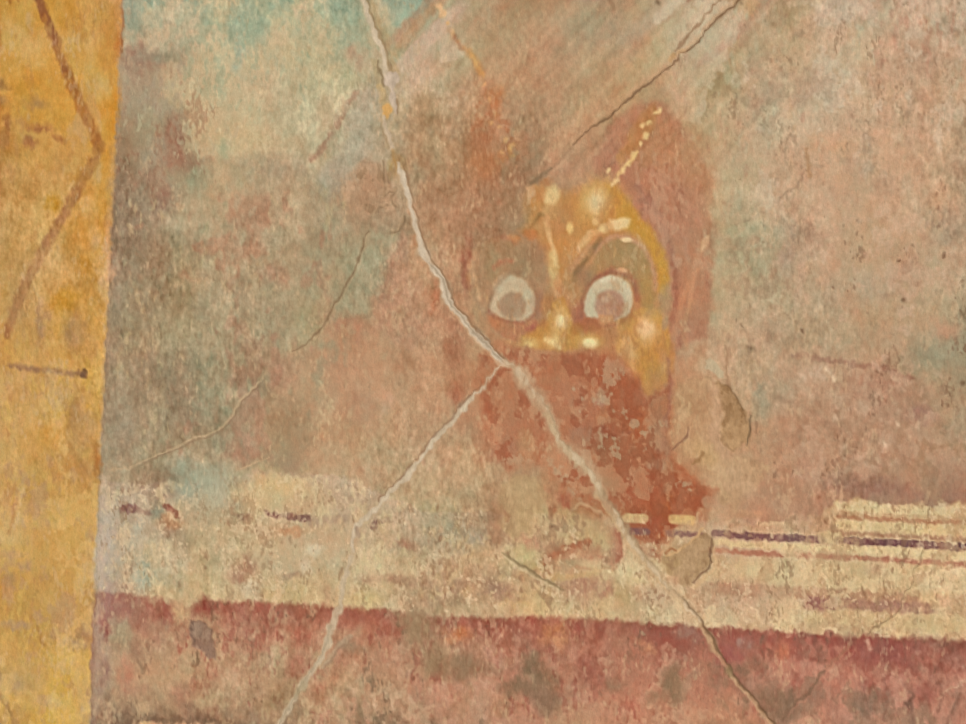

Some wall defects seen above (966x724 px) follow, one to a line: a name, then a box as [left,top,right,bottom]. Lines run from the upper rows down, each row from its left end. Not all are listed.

crack [273,0,774,724]
flaking render [667,343,771,515]
flaking render [657,511,720,590]